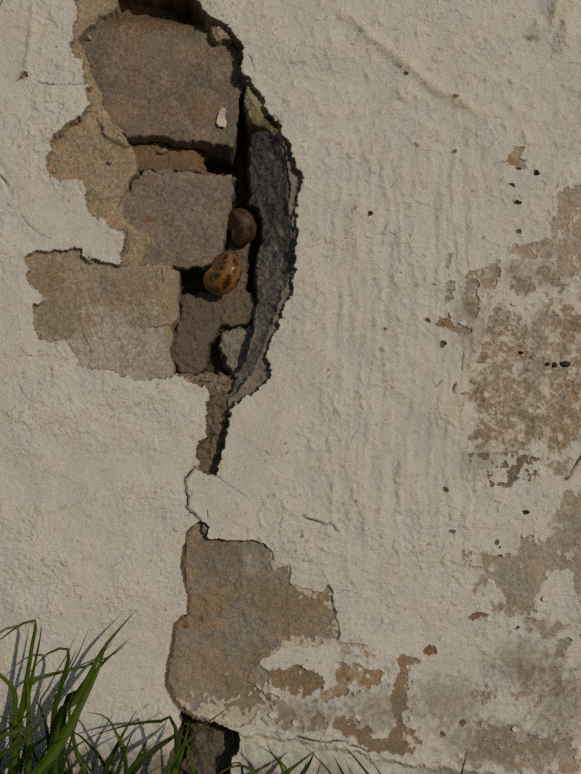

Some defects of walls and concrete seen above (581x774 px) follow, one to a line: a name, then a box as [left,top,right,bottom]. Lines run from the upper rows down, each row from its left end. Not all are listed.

spalling [23,0,304,477]
peeling [506,146,540,176]
crack [184,465,208,520]
peeling [423,183,581,719]
spalling [164,520,437,774]
peeling [431,719,581,774]